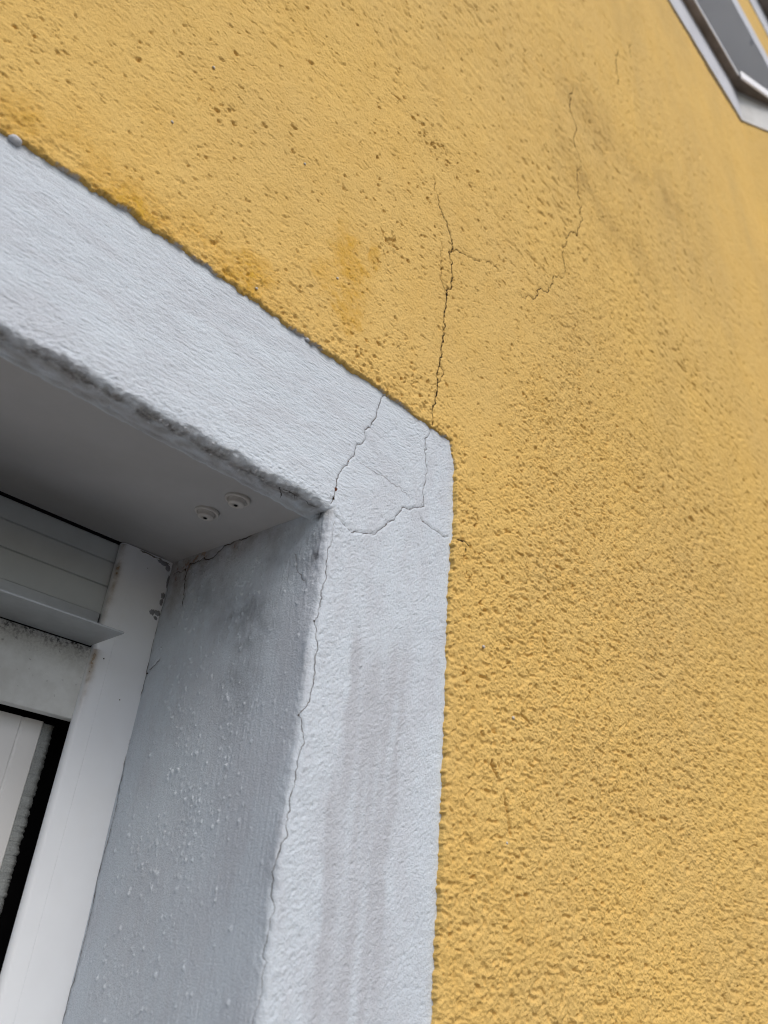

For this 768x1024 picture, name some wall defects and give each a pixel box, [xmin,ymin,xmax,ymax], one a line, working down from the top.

crack [252,186,496,1024]
crack [521,93,583,300]